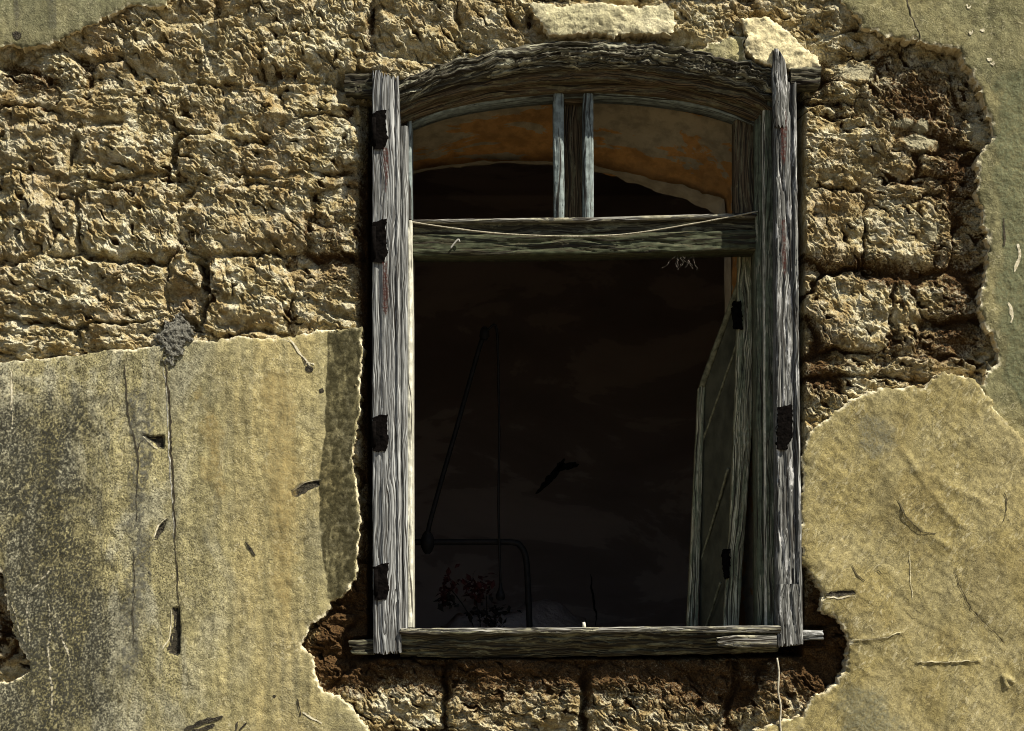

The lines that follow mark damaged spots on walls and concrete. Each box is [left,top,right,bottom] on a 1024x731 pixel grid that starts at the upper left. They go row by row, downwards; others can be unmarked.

flaking render [0,0,997,453]
crack [129,553,137,646]
crack [124,364,180,606]
flaking render [302,386,847,731]
peeling [826,590,856,599]